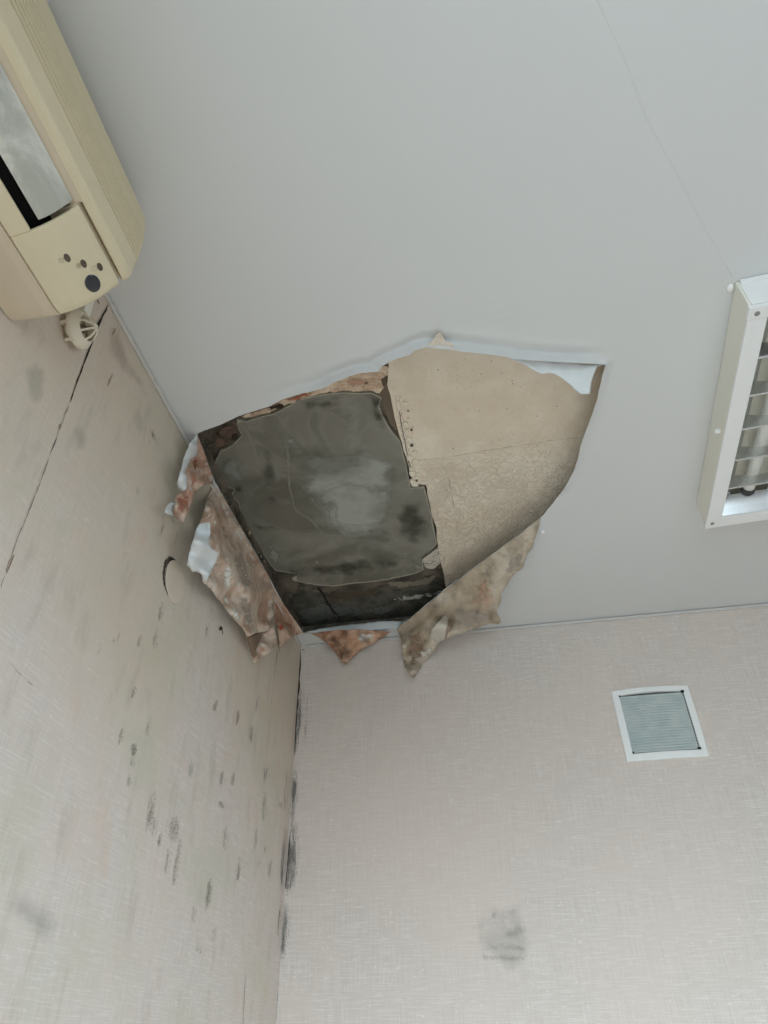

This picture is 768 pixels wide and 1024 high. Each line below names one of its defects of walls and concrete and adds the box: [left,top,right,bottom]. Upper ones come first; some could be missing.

spalling [213,363,389,448]
peeling [406,427,419,487]
spalling [218,483,265,564]
damp [198,378,443,632]
spalling [422,545,440,569]
damp [253,773,300,959]